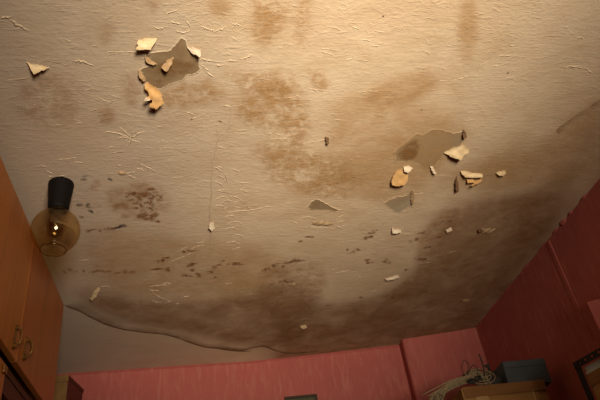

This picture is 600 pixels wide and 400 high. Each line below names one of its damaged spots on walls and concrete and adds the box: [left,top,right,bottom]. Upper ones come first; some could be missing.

peeling [27,62,49,74]
peeling [136,37,201,110]
peeling [308,199,341,212]
peeling [383,128,483,214]
water stain [186,196,553,357]